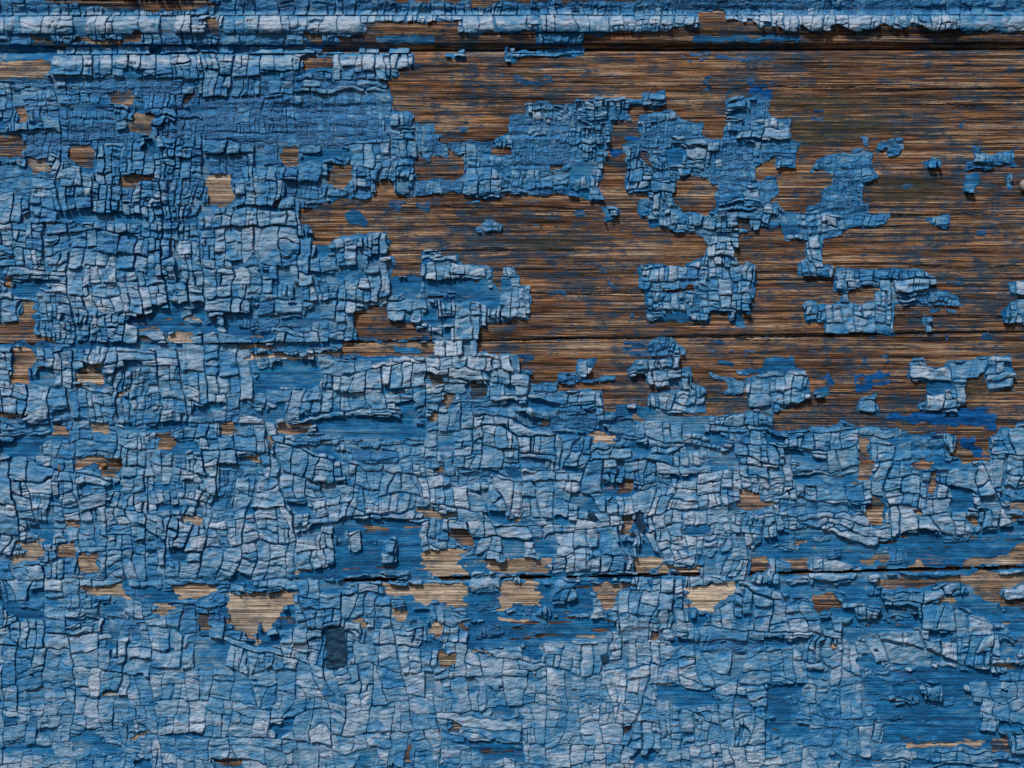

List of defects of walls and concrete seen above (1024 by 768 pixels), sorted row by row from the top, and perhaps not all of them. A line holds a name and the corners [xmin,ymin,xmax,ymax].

peeling [216,0,1024,144]
crack [683,84,1022,106]
peeling [0,0,417,294]
peeling [494,104,611,203]
peeling [622,95,962,337]
crack [0,314,1024,346]
peeling [0,215,886,768]
crack [345,576,404,584]
crack [502,572,577,580]
crack [613,571,700,579]
peeling [490,336,1024,749]
crack [924,565,1024,573]